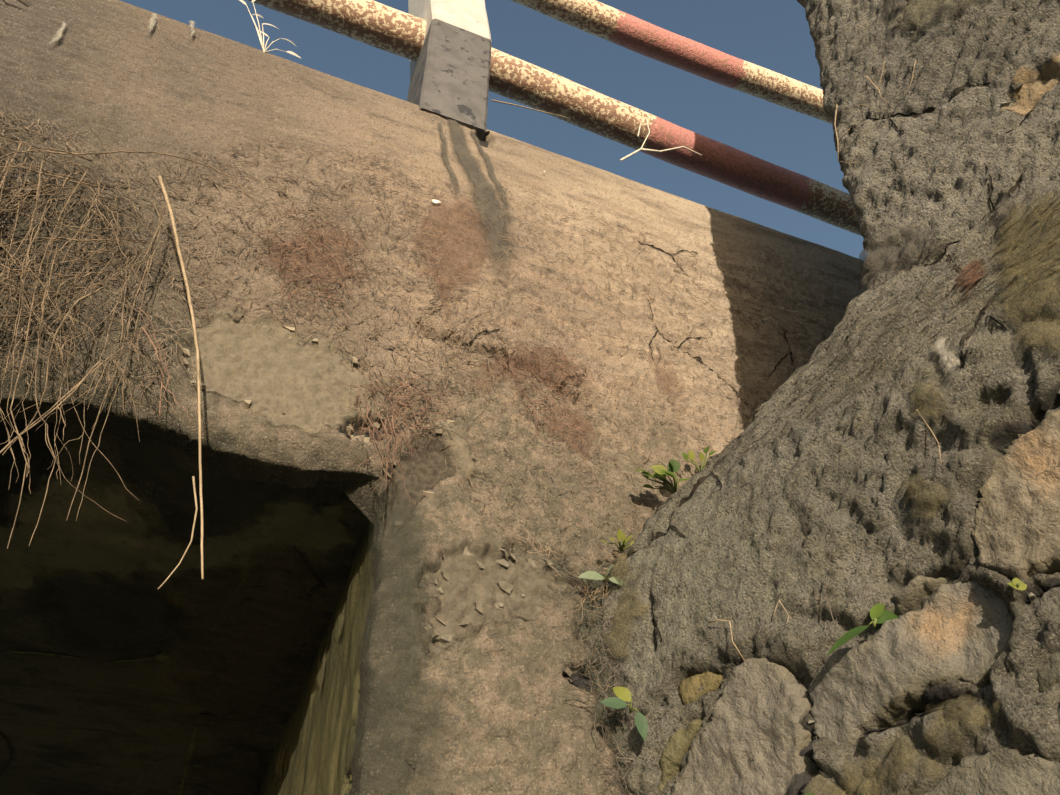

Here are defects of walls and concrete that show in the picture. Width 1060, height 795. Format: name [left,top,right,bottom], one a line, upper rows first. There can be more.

crack [848,82,991,135]
crack [638,241,698,275]
crack [424,329,585,405]